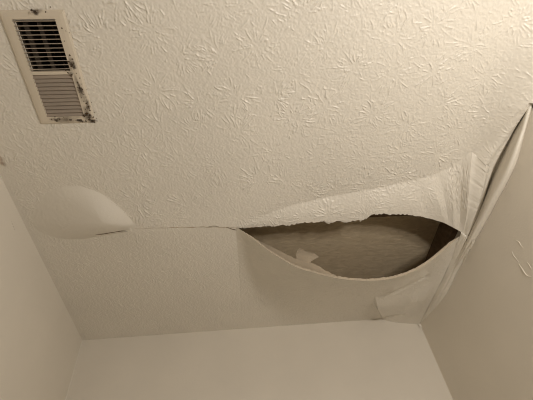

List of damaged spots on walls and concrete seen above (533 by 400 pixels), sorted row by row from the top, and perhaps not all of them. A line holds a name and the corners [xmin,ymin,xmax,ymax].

water stain [65,54,97,123]
peeling [420,103,533,324]